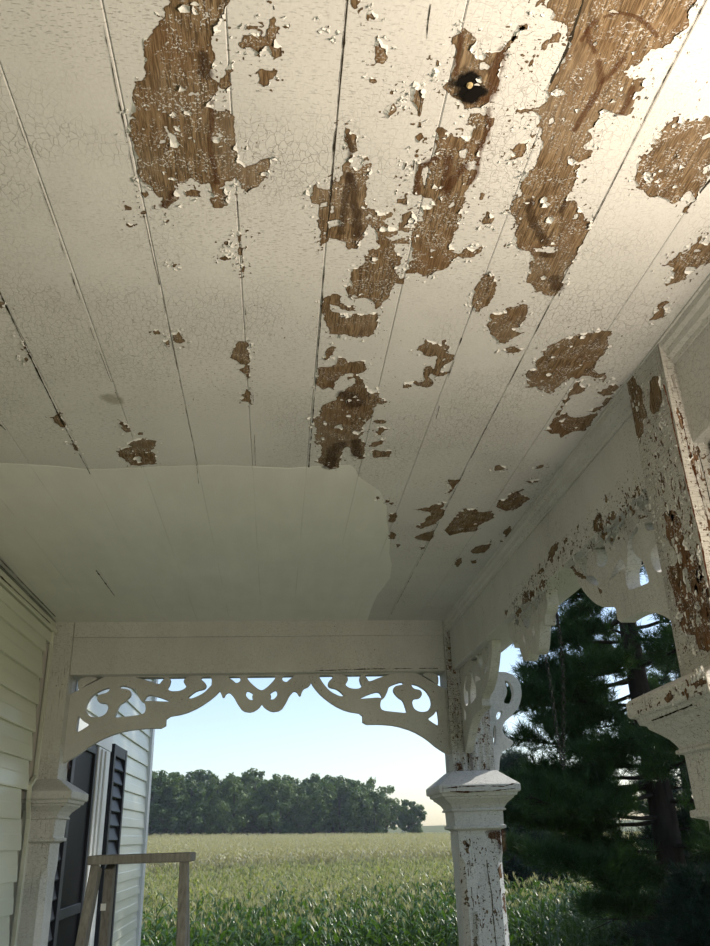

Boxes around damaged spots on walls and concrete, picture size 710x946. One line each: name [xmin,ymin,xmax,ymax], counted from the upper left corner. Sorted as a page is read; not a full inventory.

peeling [116,0,291,230]
peeling [213,227,261,278]
peeling [302,0,710,717]
peeling [116,419,162,467]
peeling [445,632,495,771]
peeling [459,831,509,946]